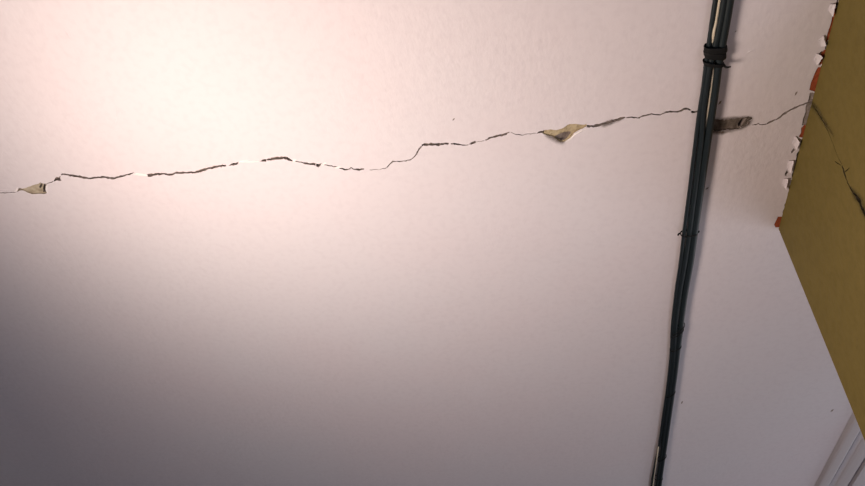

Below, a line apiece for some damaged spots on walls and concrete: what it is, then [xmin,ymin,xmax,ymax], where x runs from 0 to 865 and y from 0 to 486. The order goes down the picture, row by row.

spalling [542,124,587,142]
crack [587,108,697,128]
spalling [713,116,752,131]
crack [47,131,543,184]
crack [754,99,865,216]
spalling [15,182,48,194]